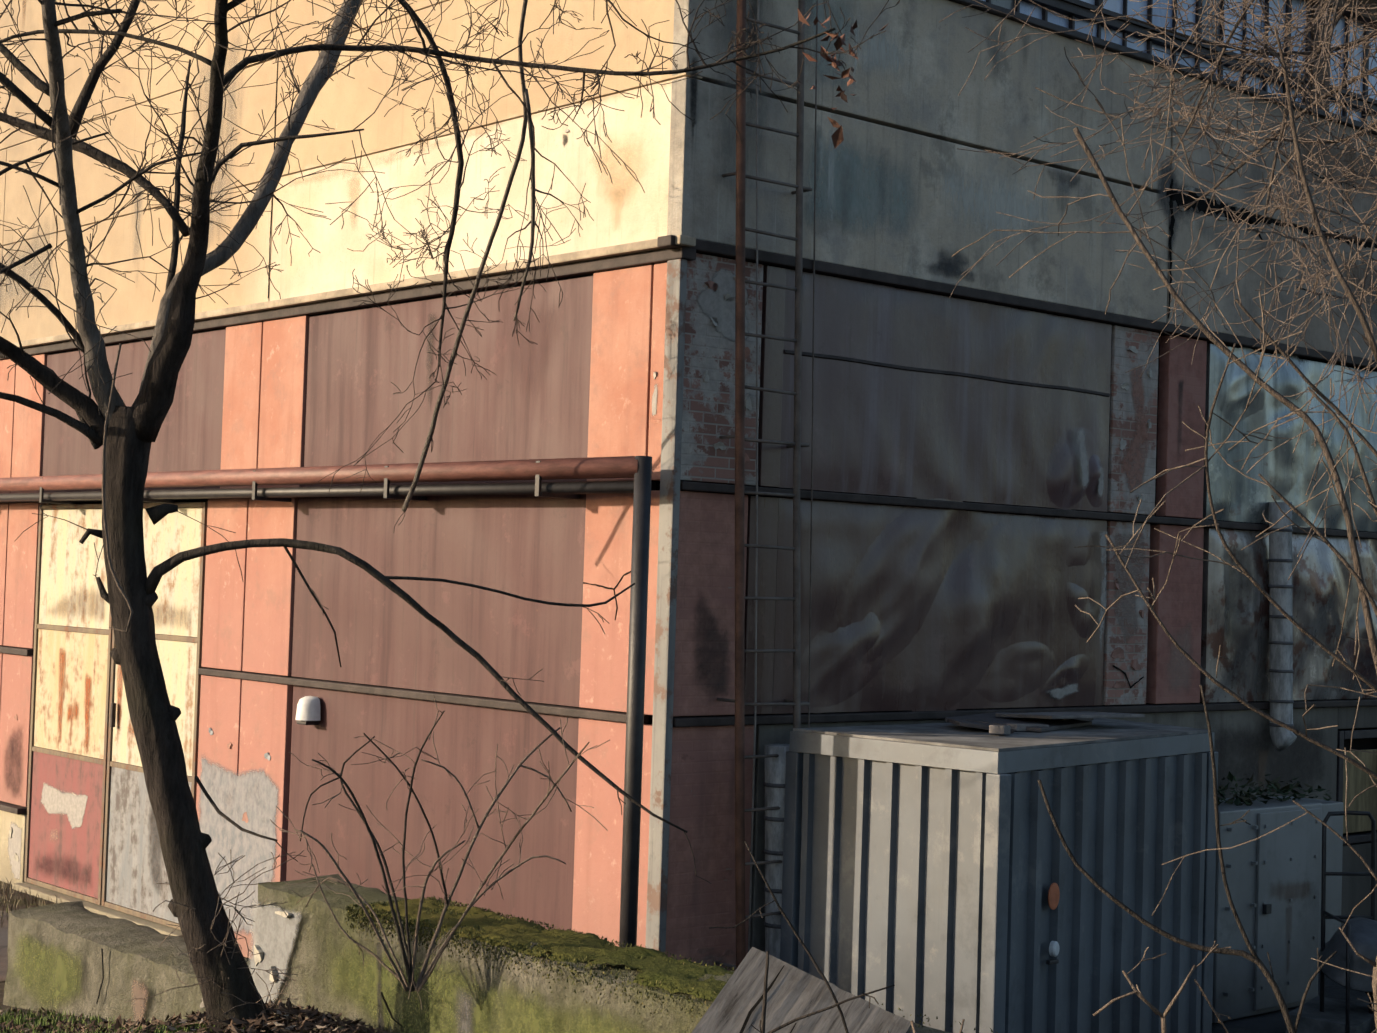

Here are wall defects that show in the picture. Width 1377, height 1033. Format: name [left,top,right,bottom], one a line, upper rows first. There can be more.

leakage [810,147,910,228]
leakage [932,252,970,277]
peeling [697,269,750,360]
peeling [1119,346,1153,501]
rust [58,652,91,746]
peeling [41,783,88,829]
peeling [199,752,301,1003]